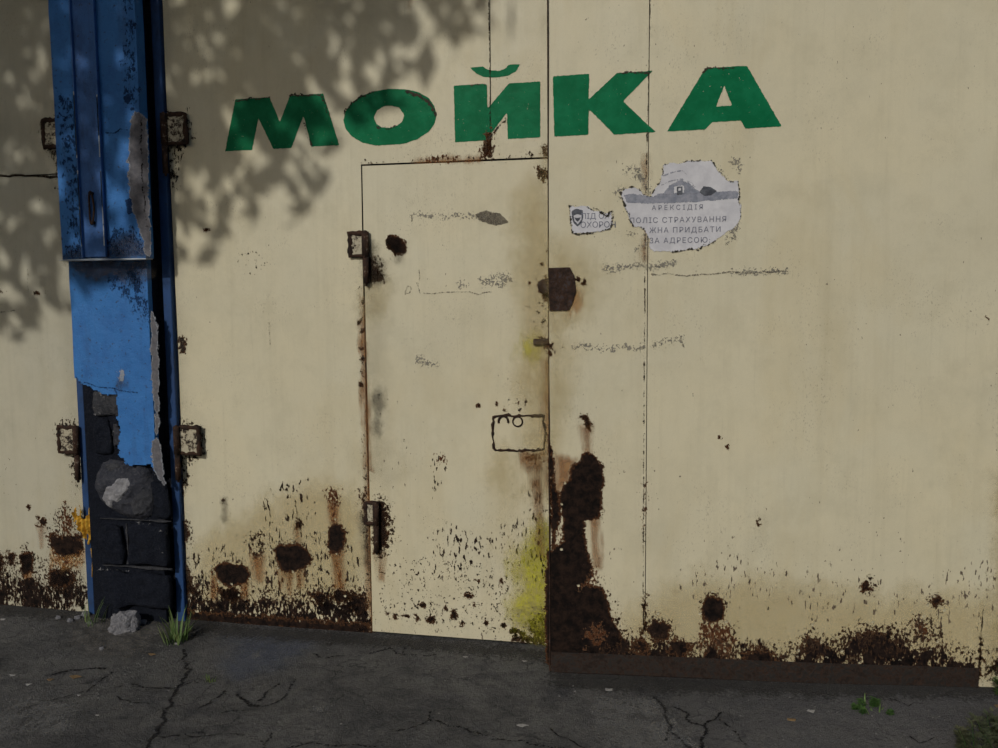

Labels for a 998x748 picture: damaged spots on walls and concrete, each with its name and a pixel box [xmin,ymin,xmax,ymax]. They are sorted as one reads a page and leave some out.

peeling [123,87,152,256]
spalling [92,311,174,609]
rust [184,245,998,686]
rust [0,500,88,611]
water stain [512,521,549,634]
crack [14,649,585,748]
crack [652,696,748,748]